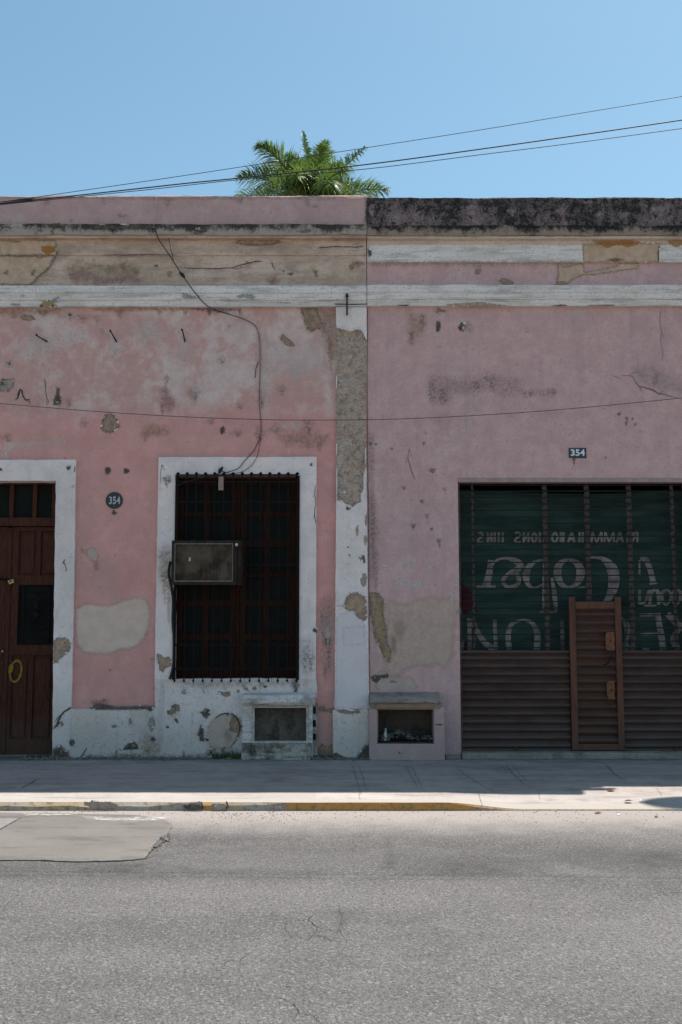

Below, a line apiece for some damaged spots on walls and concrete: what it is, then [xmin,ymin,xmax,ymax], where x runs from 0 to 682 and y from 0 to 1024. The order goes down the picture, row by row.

peeling [556,241,661,285]
crack [612,372,677,398]
spalling [100,413,120,434]
spalling [336,326,367,510]
spalling [344,516,391,683]
spalling [52,637,71,664]
spalling [156,654,172,672]
peeling [90,689,188,742]